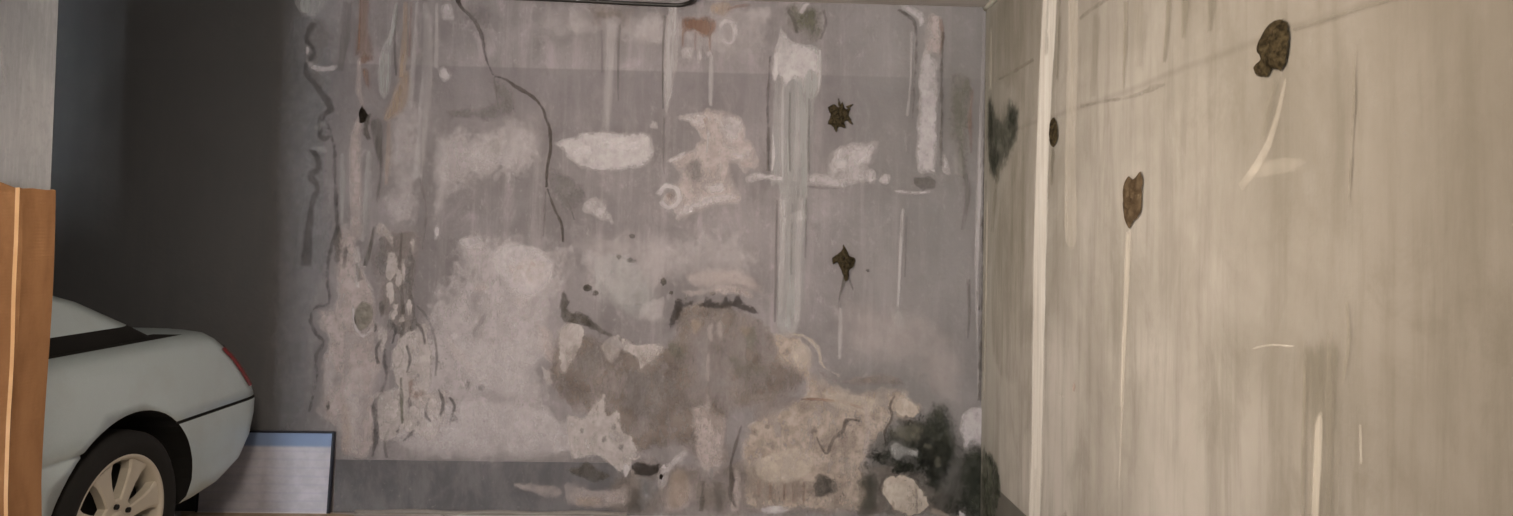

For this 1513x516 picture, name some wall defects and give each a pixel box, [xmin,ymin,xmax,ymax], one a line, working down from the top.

crack [455,0,585,242]
peeling [371,223,456,457]
peeling [542,323,585,385]
peeling [517,393,663,507]
peeling [607,334,664,370]
damp [273,0,1097,516]
peeling [728,333,921,514]